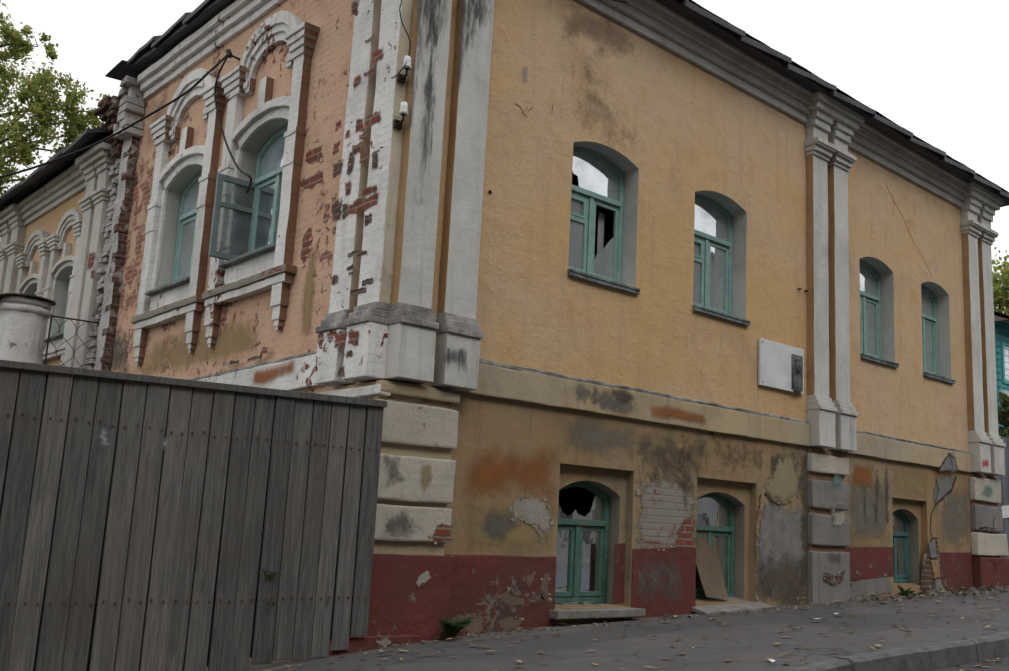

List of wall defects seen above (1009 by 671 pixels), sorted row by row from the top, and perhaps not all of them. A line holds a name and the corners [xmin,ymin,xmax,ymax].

spalling [353,34,383,87]
damp [409,0,447,159]
damp [458,0,485,84]
spalling [299,111,380,225]
peeling [119,159,154,318]
spalling [332,250,373,296]
spalling [333,330,359,377]
damp [577,388,632,413]
damp [387,514,411,534]
flaking render [635,477,697,551]
damp [756,453,809,605]
crack [930,452,958,541]